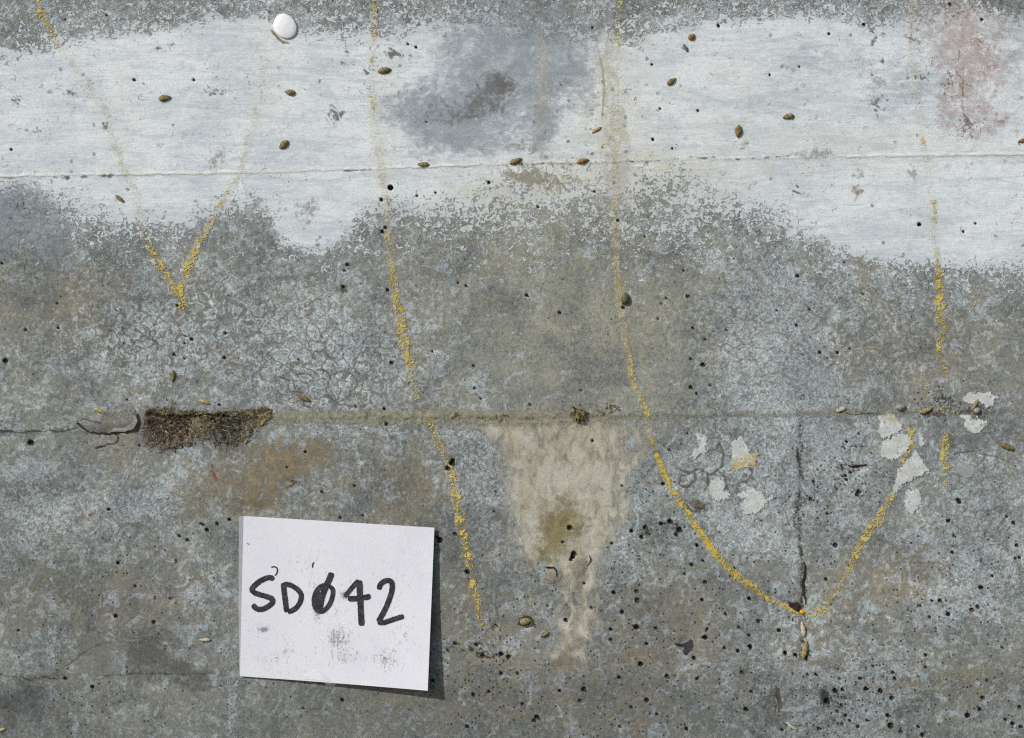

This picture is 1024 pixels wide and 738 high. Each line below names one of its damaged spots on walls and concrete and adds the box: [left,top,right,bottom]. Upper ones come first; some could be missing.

leakage [0,9,589,191]
crack [0,409,140,449]
peeling [690,433,707,458]
peeling [730,436,758,470]
peeling [877,414,929,514]
peeling [960,391,999,434]
peeling [709,477,773,514]
leakage [269,406,716,669]
crack [793,425,809,661]